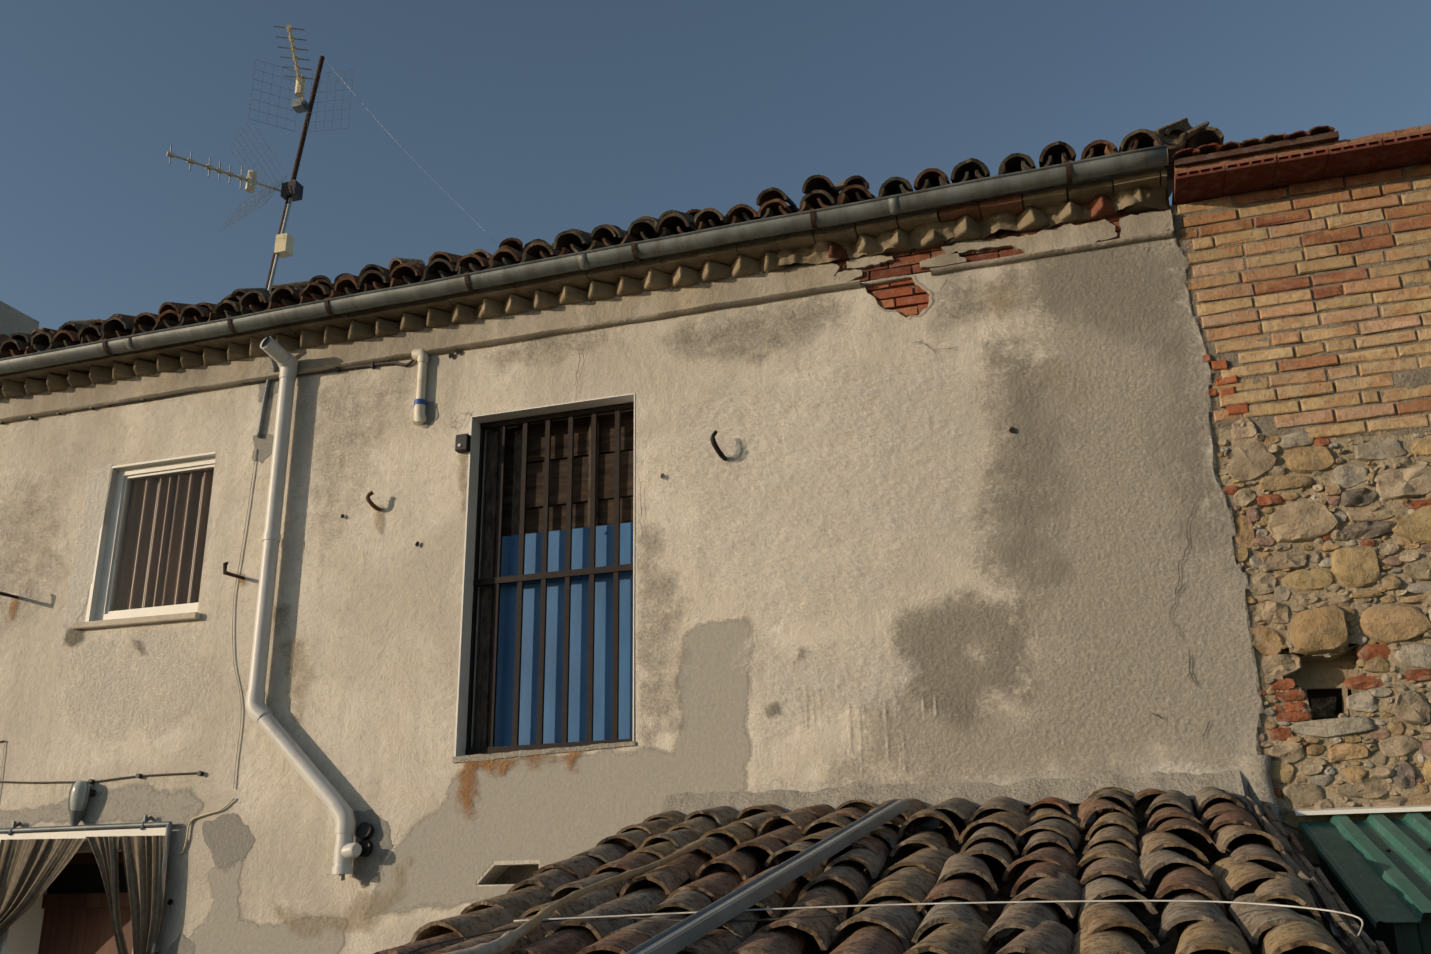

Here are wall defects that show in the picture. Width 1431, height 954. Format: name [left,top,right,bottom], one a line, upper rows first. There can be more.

flaking render [828,192,1174,320]
damp [747,247,1262,786]
crack [1170,487,1210,739]
rust [458,759,512,814]